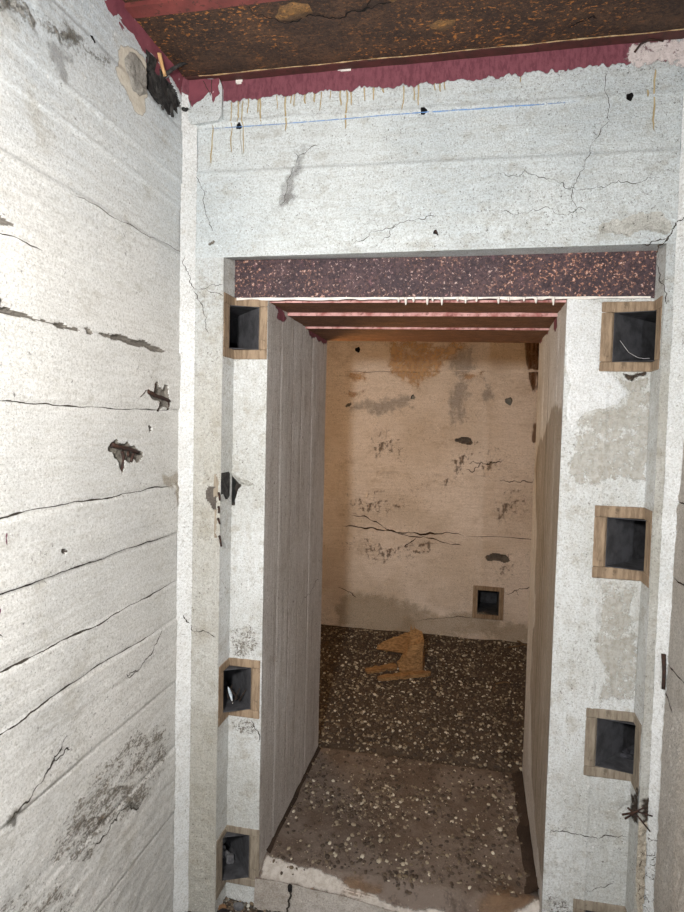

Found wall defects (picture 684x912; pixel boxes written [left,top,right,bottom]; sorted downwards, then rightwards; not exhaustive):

rust [275,2,313,21]
rust [429,19,456,32]
spalling [116,45,189,121]
rust [230,98,261,153]
rust [276,90,352,131]
peeling [221,38,684,103]
crack [3,400,177,411]
spalling [104,376,173,480]
crack [0,535,169,595]
crack [0,581,174,673]
crack [0,626,163,735]
crack [13,736,71,815]